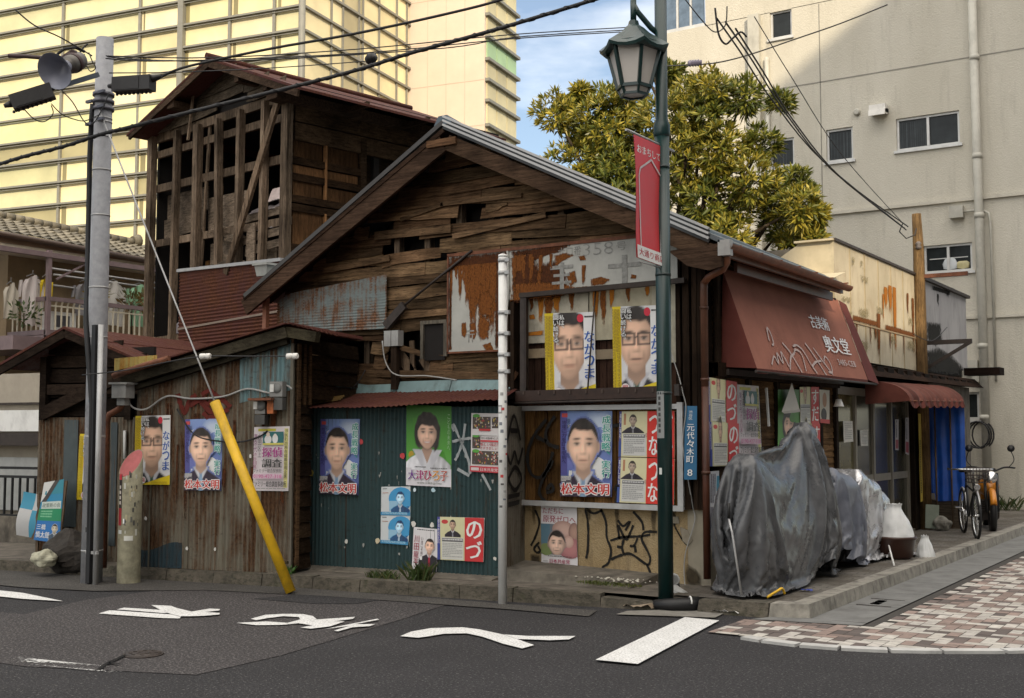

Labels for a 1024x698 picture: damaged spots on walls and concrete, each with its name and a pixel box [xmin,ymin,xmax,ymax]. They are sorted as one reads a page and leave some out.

corrosion [528,293,575,336]
corrosion [592,288,630,322]
corrosion [853,285,917,355]